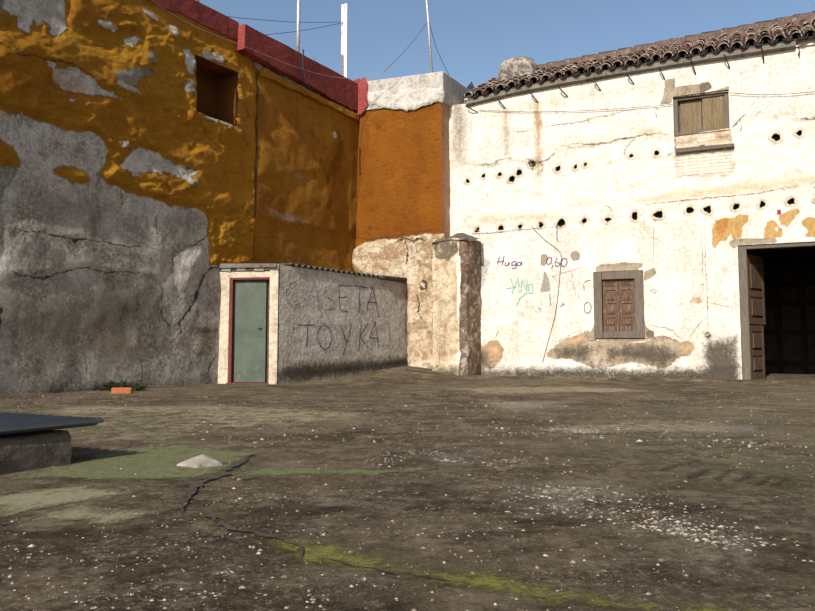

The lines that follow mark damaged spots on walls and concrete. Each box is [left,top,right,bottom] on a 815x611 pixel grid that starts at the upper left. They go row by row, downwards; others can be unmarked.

peeling [0,0,67,36]
peeling [47,53,157,102]
peeling [0,138,21,168]
peeling [53,165,91,184]
peeling [119,139,198,184]
crack [480,107,676,172]
peeling [712,208,815,249]
crack [2,209,217,335]
flaking render [481,340,504,369]
flaking render [547,321,694,368]